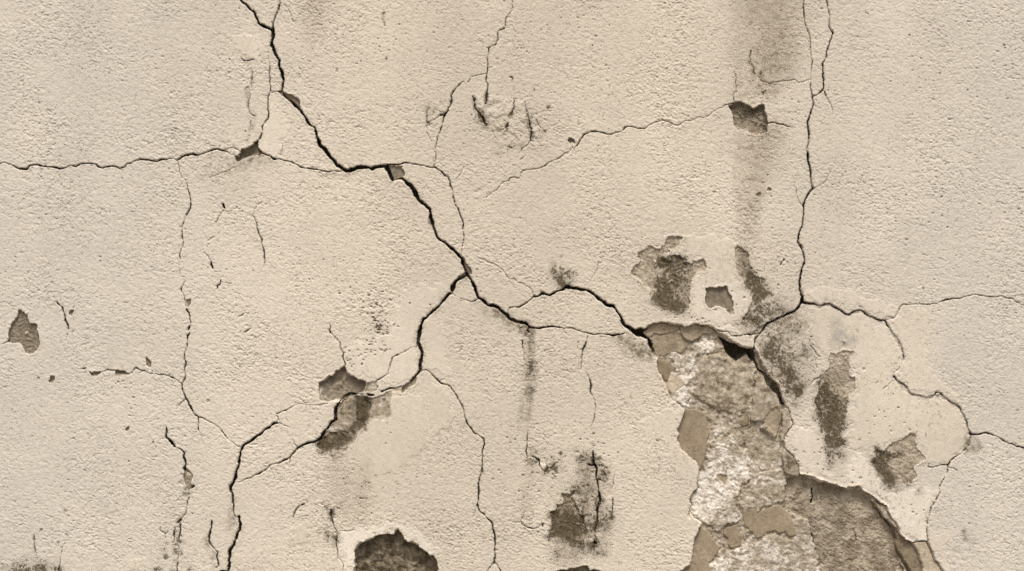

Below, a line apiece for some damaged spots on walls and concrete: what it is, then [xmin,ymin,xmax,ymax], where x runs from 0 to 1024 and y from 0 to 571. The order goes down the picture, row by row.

spalling [728,101,768,135]
spalling [8,310,40,354]
spalling [318,365,417,452]
crack [0,0,737,571]
spalling [627,236,943,571]
leakage [735,248,849,470]
crack [717,0,1024,541]
spalling [353,529,439,571]
leakage [531,451,615,555]
leakage [871,444,919,492]